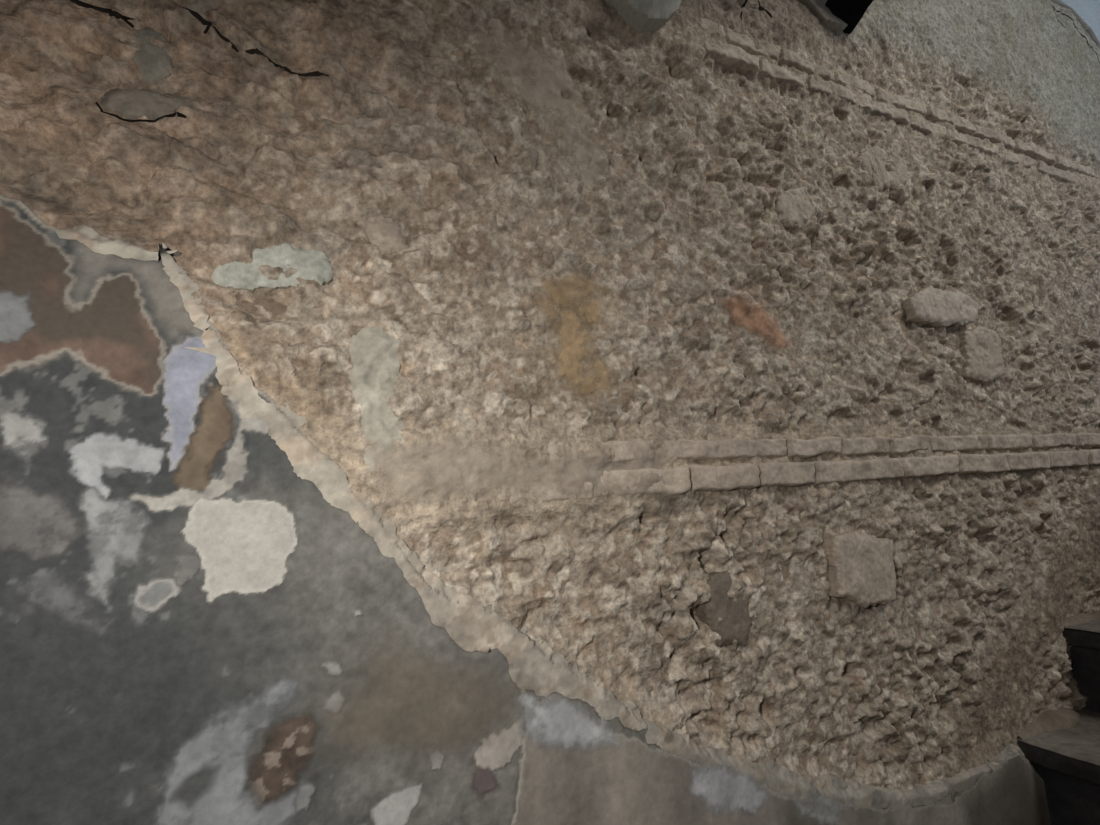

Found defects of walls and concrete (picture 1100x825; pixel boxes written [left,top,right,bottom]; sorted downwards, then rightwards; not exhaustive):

crack [70,0,140,28]
spalling [100,88,192,120]
spalling [132,27,172,84]
crack [183,7,329,77]
peeling [0,200,217,471]
spalling [55,224,357,518]
water stain [543,277,608,395]
peeling [69,433,164,604]
peeling [130,397,297,612]
spalling [351,491,647,731]
peeling [371,784,422,825]
peeling [473,719,829,825]